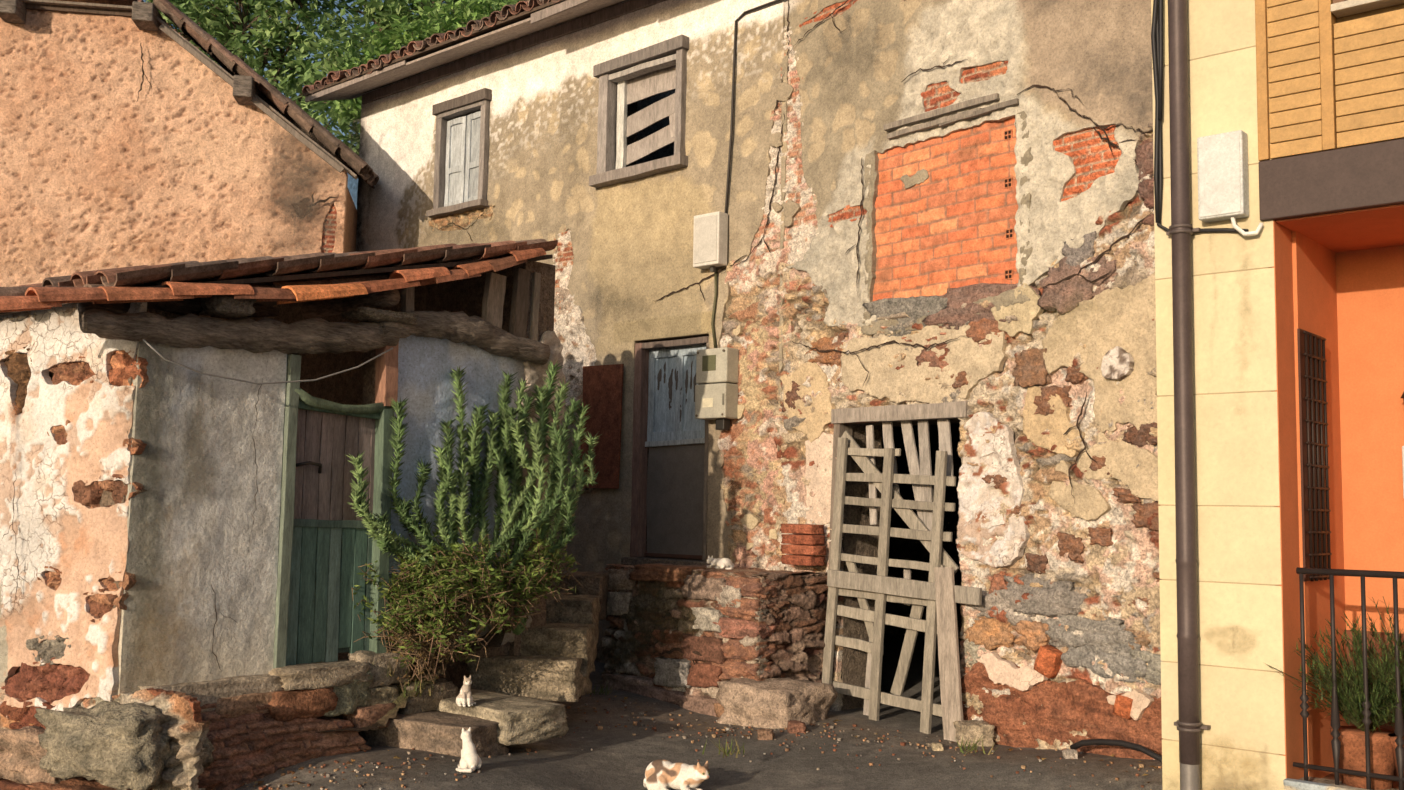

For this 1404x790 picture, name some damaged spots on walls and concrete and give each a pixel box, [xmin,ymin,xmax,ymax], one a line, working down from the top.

flaking render [921,61,1008,112]
crack [656,0,848,301]
flaking render [735,0,867,278]
flaking render [1053,124,1122,201]
crack [845,159,864,294]
spalling [4,346,32,414]
spalling [49,350,149,388]
spalling [47,420,71,445]
crack [1063,392,1097,502]
spalling [72,474,146,509]
spalling [83,572,136,623]
spalling [0,635,90,729]